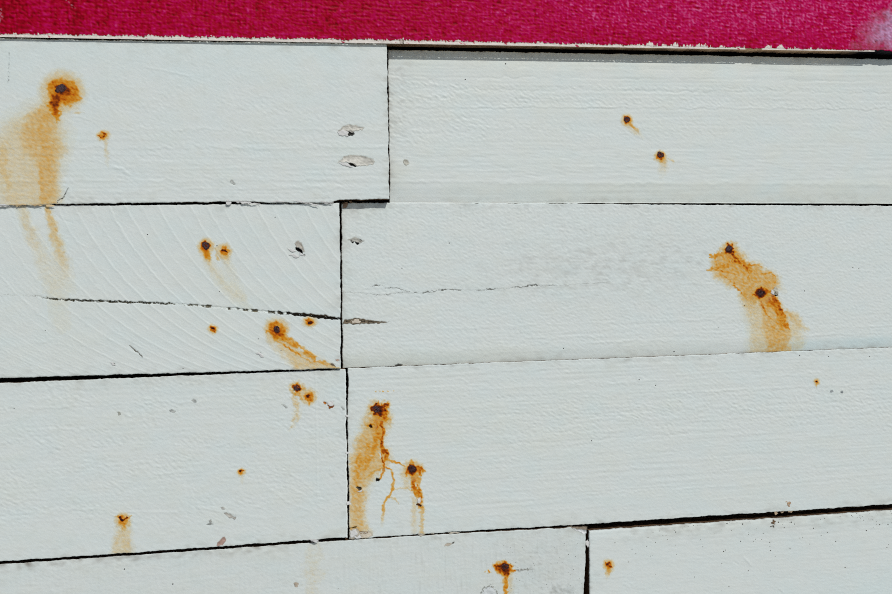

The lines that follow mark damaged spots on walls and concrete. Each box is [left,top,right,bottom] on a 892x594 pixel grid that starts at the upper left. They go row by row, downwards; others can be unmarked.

rust [20,77,83,245]
rust [199,239,231,260]
crack [47,297,342,320]
rust [707,242,796,352]
rust [266,320,335,368]
rust [290,382,314,405]
rust [350,391,426,533]
rust [116,514,130,529]
rust [485,560,516,594]